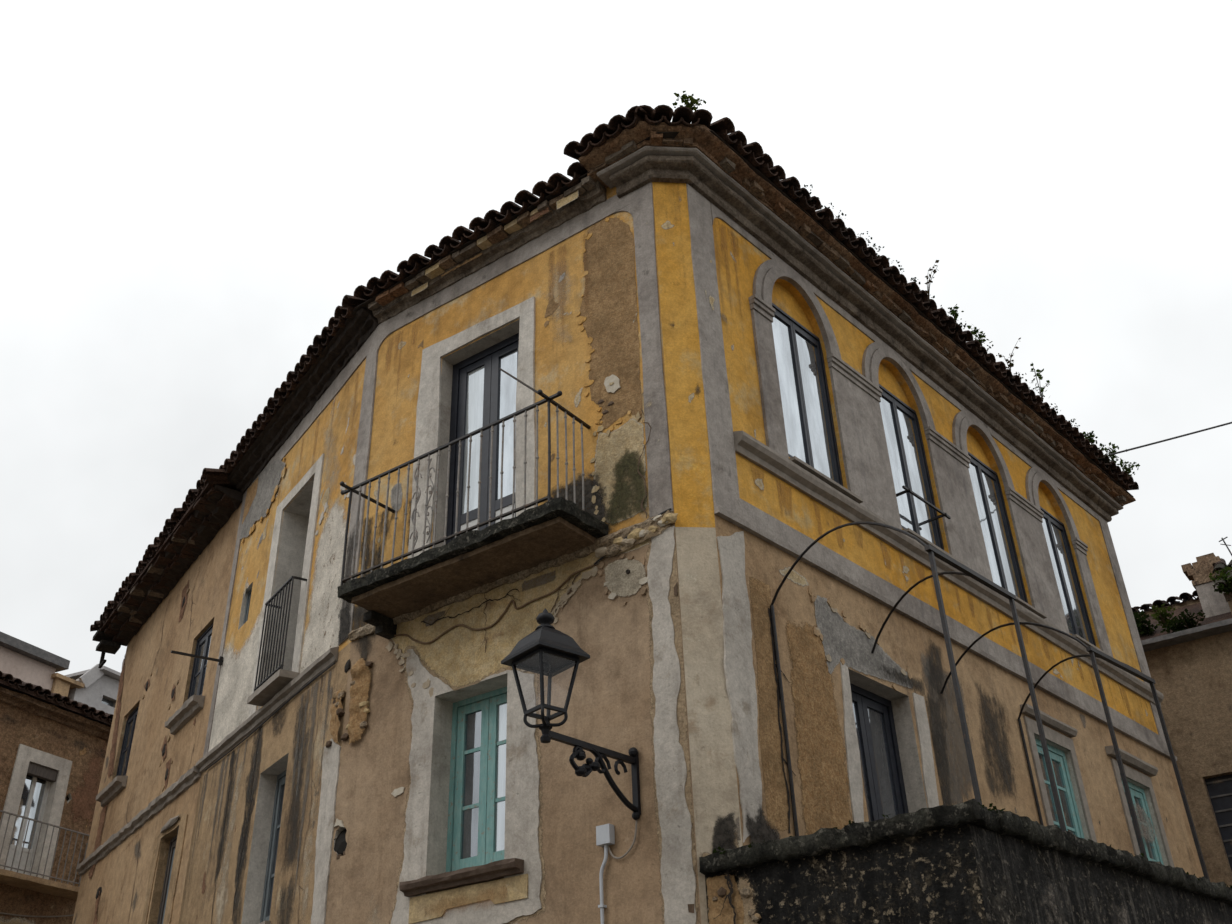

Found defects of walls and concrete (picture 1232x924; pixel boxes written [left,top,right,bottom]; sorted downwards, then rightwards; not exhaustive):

flaking render [385,217,678,697]
peeling [300,482,351,673]
crack [421,589,521,653]
crack [550,572,584,618]
leakage [193,673,331,924]
leakage [884,644,1014,806]